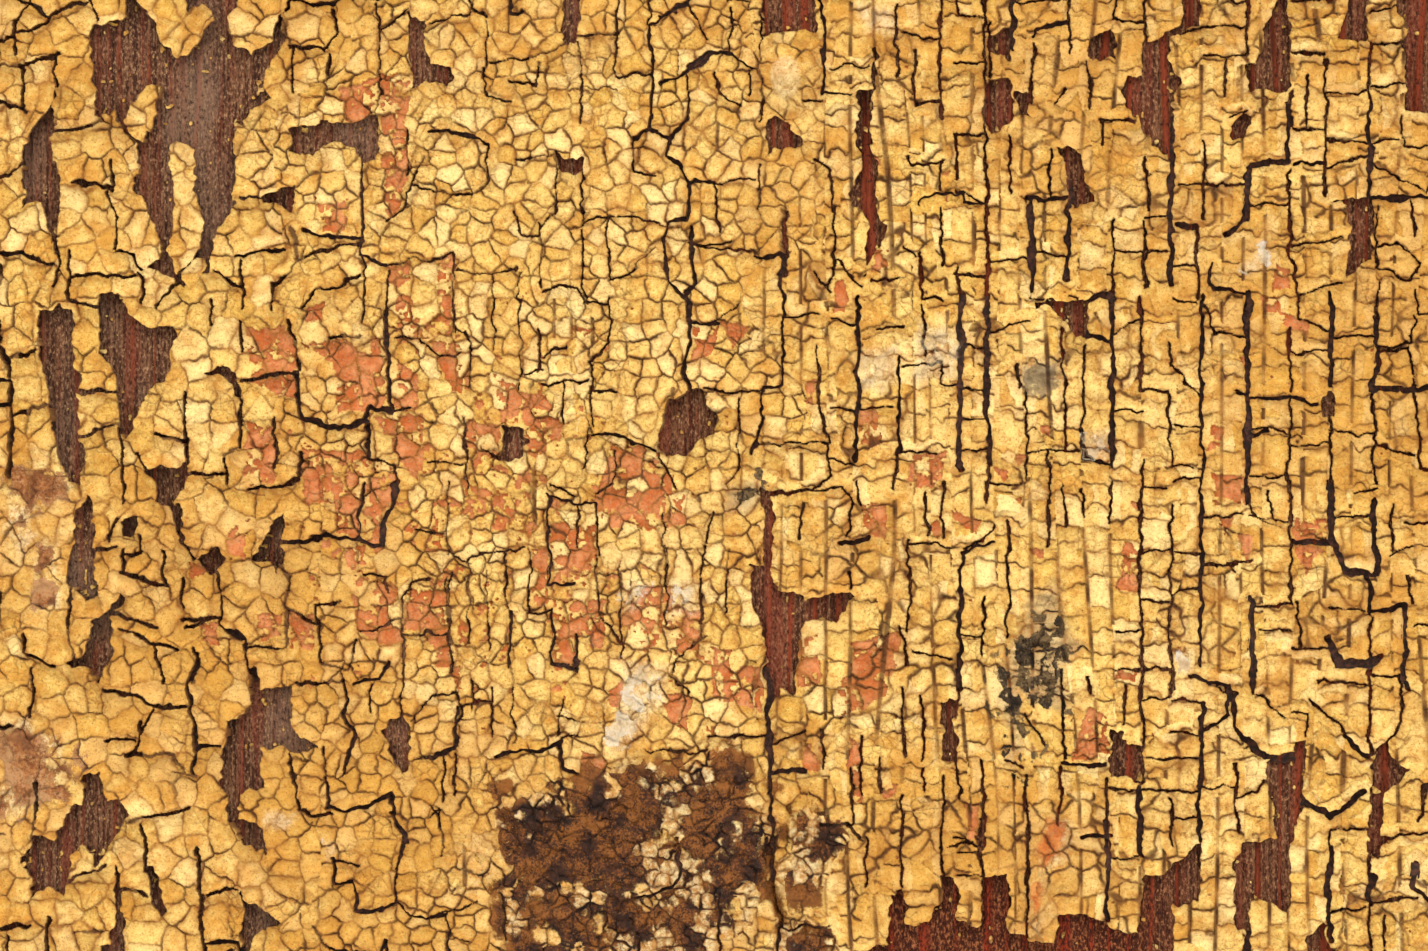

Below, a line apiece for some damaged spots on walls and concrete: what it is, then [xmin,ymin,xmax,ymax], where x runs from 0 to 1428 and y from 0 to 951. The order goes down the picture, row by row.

peeling [0,0,471,951]
crack [238,162,400,548]
peeling [464,370,564,478]
crack [634,0,754,389]
peeling [532,320,903,721]
peeling [738,0,825,39]
crack [955,294,993,469]
crack [1026,180,1118,468]
crack [1165,104,1336,841]
peeling [1215,0,1428,154]
crack [1293,483,1411,689]
peeling [831,684,1428,951]